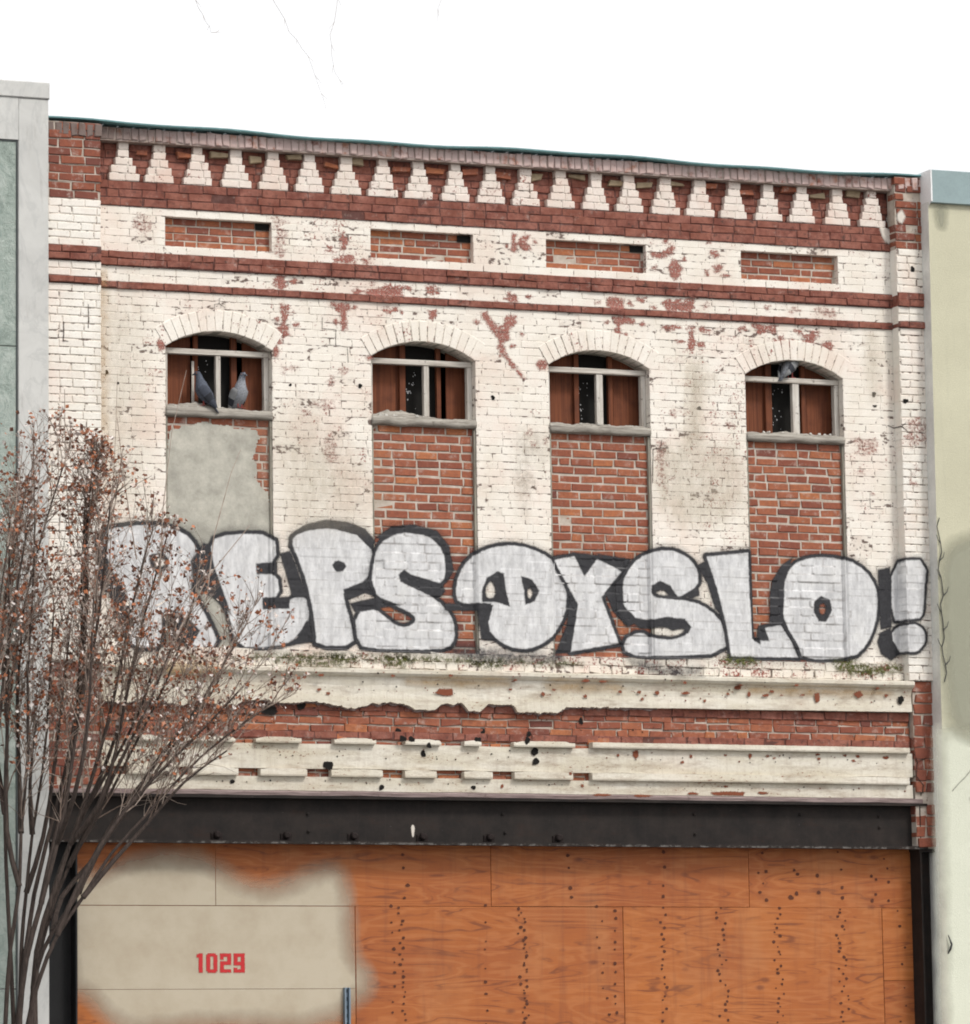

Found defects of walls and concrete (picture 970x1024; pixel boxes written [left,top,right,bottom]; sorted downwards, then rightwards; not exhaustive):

peeling [325,231,368,264]
peeling [629,238,687,280]
peeling [705,239,730,277]
peeling [268,275,300,357]
peeling [331,282,411,331]
peeling [425,284,440,321]
peeling [474,292,531,379]
peeling [597,296,710,339]
peeling [737,305,834,353]